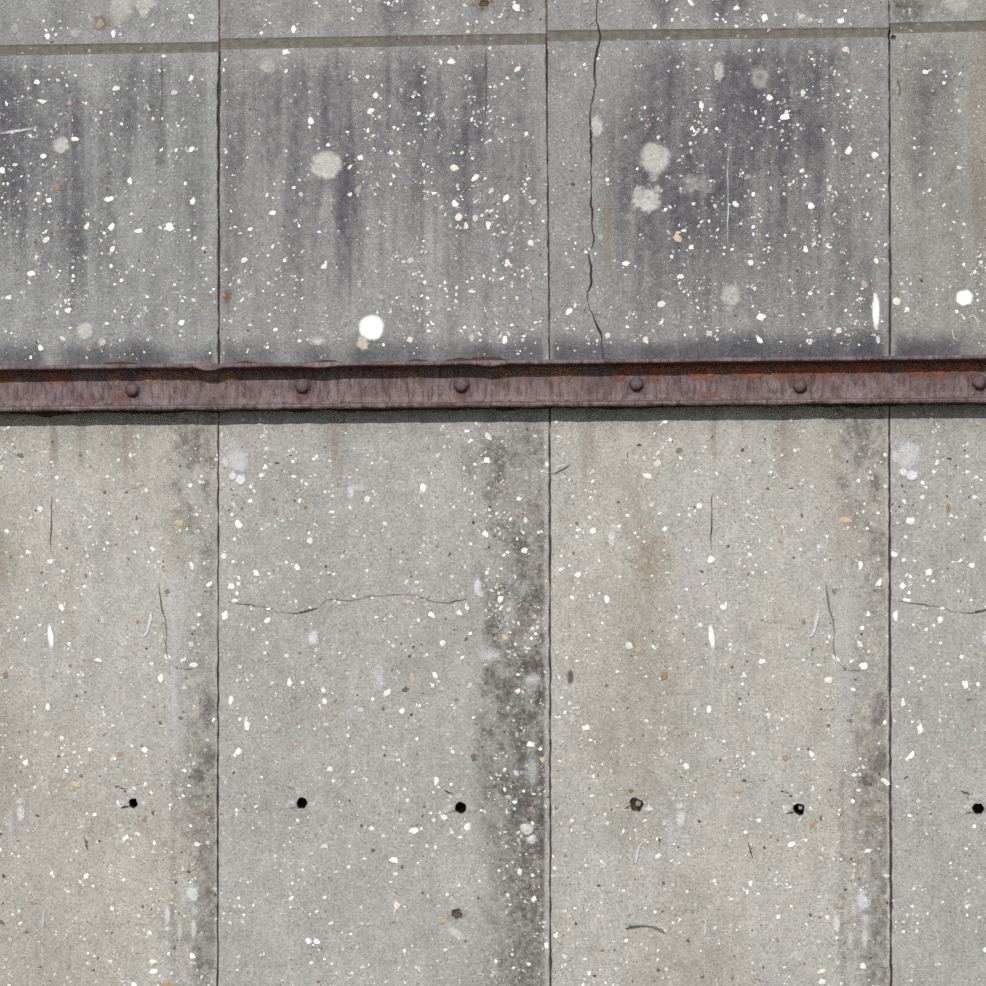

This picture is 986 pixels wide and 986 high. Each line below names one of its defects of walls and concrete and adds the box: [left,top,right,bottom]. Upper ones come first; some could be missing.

water stain [750,58,793,176]
water stain [5,84,36,194]
crack [587,0,604,359]
water stain [642,339,882,359]
corrosion [0,372,70,382]
corrosion [616,363,885,380]
corrosion [902,362,980,375]
corrosion [0,392,768,417]
water stain [481,633,544,986]